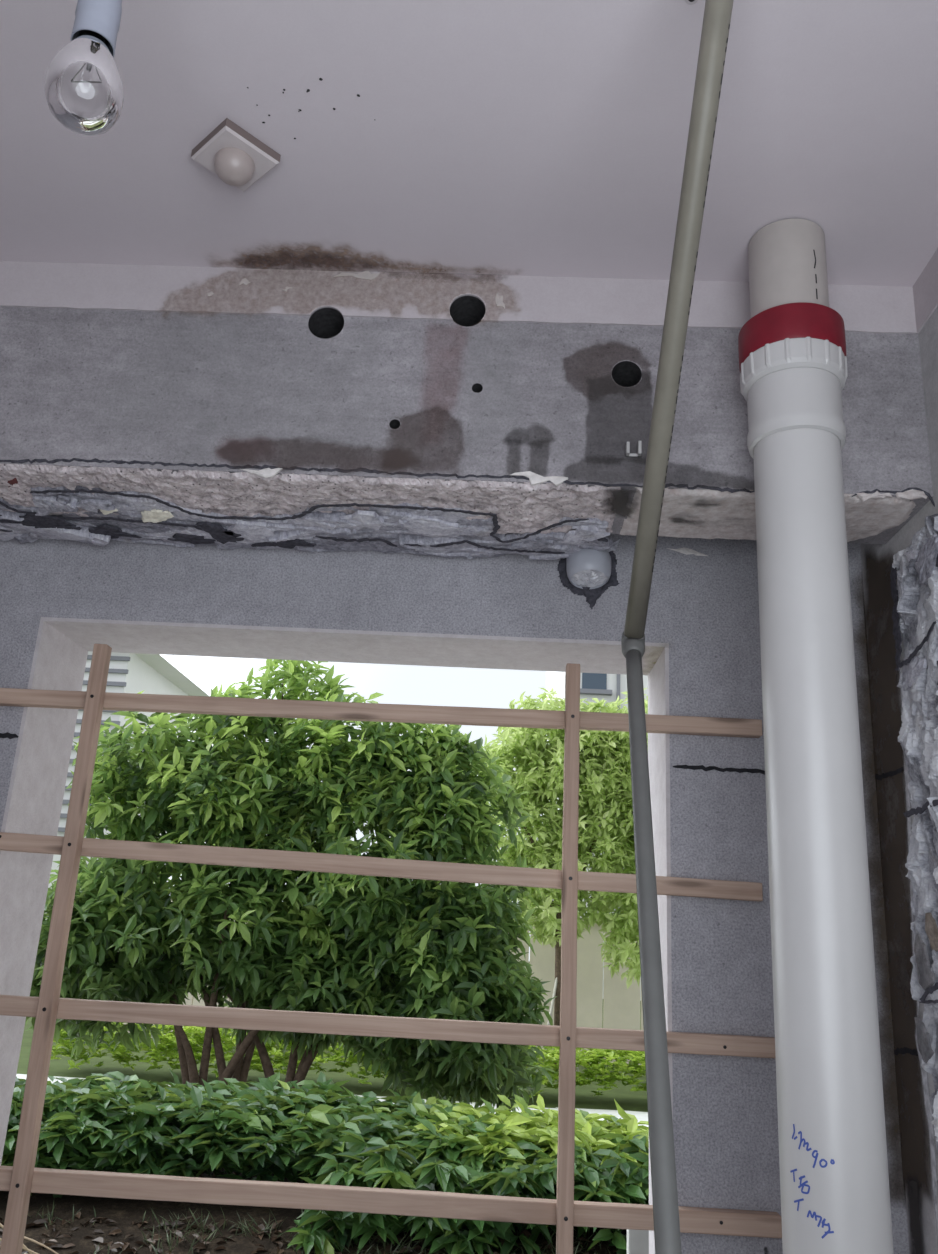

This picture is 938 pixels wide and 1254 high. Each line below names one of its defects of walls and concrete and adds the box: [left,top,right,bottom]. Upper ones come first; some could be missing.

damp [566,344,639,395]
damp [222,410,456,470]
spalling [0,458,643,609]
spalling [658,483,756,556]
crack [0,731,19,739]
crack [673,765,765,775]
spalling [844,487,938,1234]